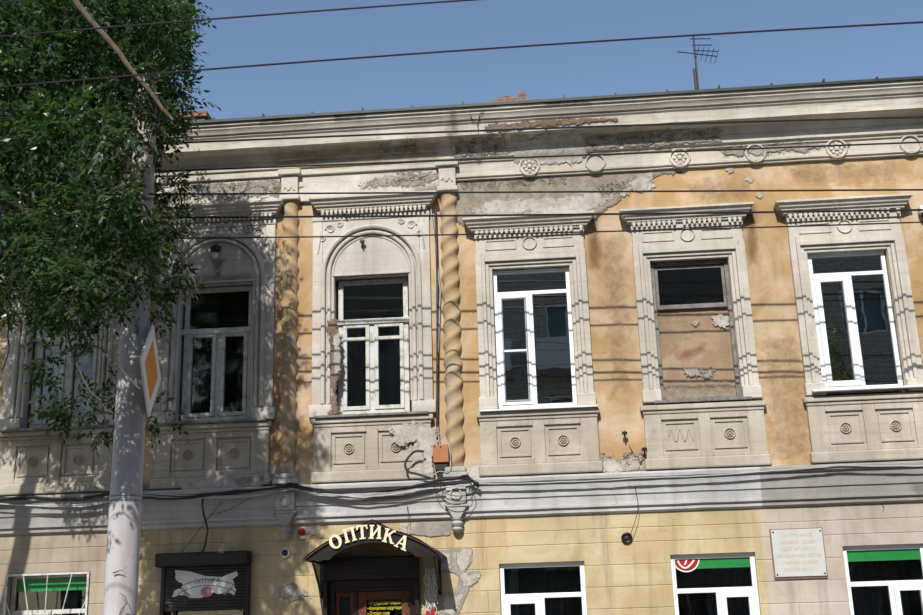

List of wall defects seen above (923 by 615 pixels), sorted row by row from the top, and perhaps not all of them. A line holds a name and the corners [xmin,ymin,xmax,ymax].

peeling [358,169,439,190]
peeling [453,116,850,226]
flaking render [326,318,341,415]
peeling [388,420,441,475]
peeling [600,447,647,473]
peeling [399,521,452,537]
peeling [278,583,309,602]
spalling [436,548,481,615]